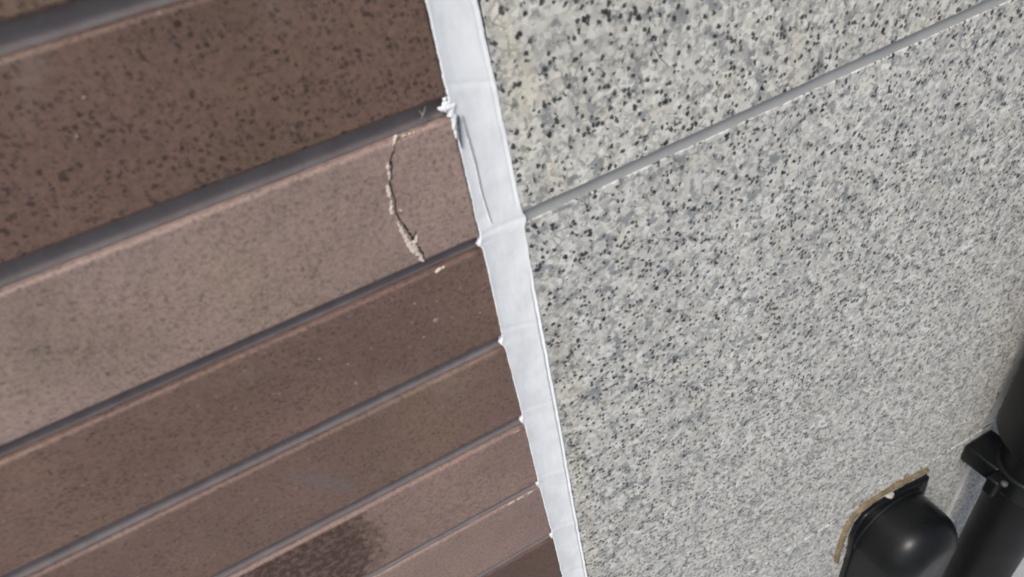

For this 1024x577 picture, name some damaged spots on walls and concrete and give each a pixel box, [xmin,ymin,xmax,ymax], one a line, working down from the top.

crack [386,134,424,262]